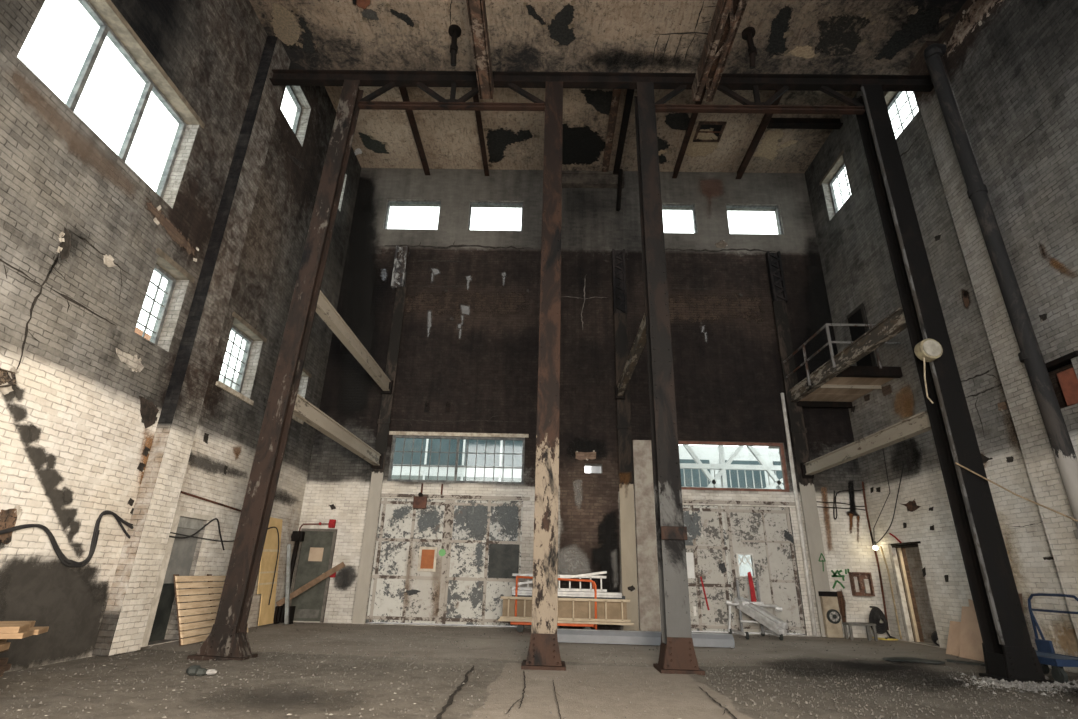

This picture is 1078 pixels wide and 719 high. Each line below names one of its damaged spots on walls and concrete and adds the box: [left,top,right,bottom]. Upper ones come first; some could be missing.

spalling [523,0,576,46]
spalling [874,0,1002,61]
spalling [484,126,540,167]
spalling [562,89,613,167]
crack [0,232,131,370]
spalling [0,367,19,395]
peeling [388,503,441,538]
peeling [464,501,522,578]
peeling [683,506,704,542]
crack [434,665,474,719]